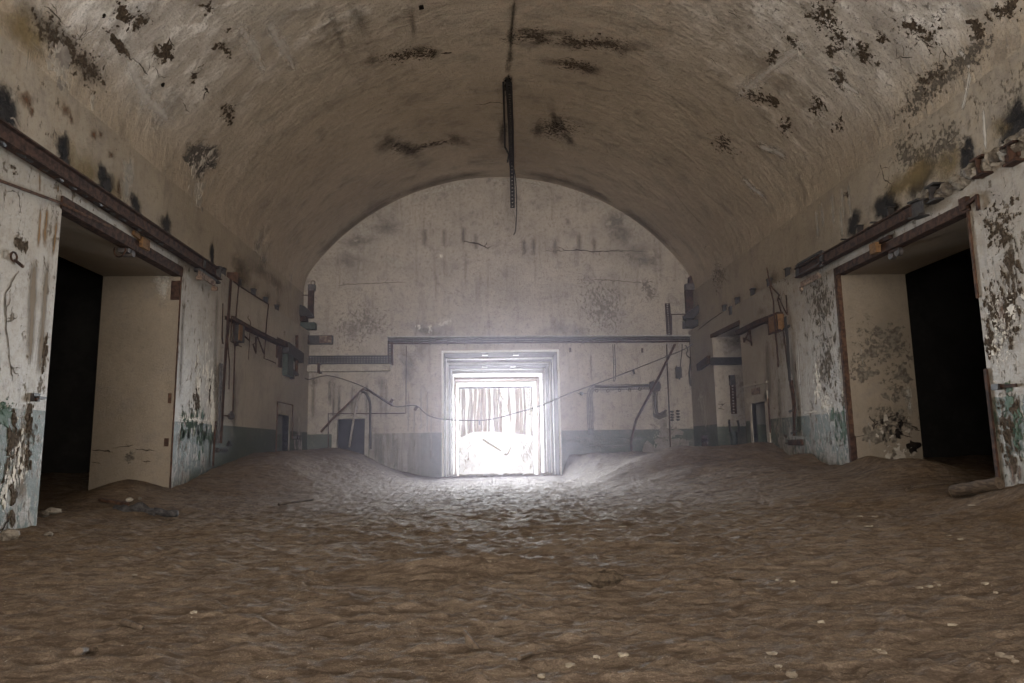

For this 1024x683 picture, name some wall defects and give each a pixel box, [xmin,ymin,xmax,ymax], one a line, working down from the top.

spalling [26,0,153,94]
peeling [183,134,219,194]
spalling [739,87,797,138]
spalling [764,0,1024,208]
rust [38,209,57,253]
peeling [175,333,219,460]
peeling [802,267,919,459]
peeling [979,192,1024,484]
peeling [0,396,38,528]